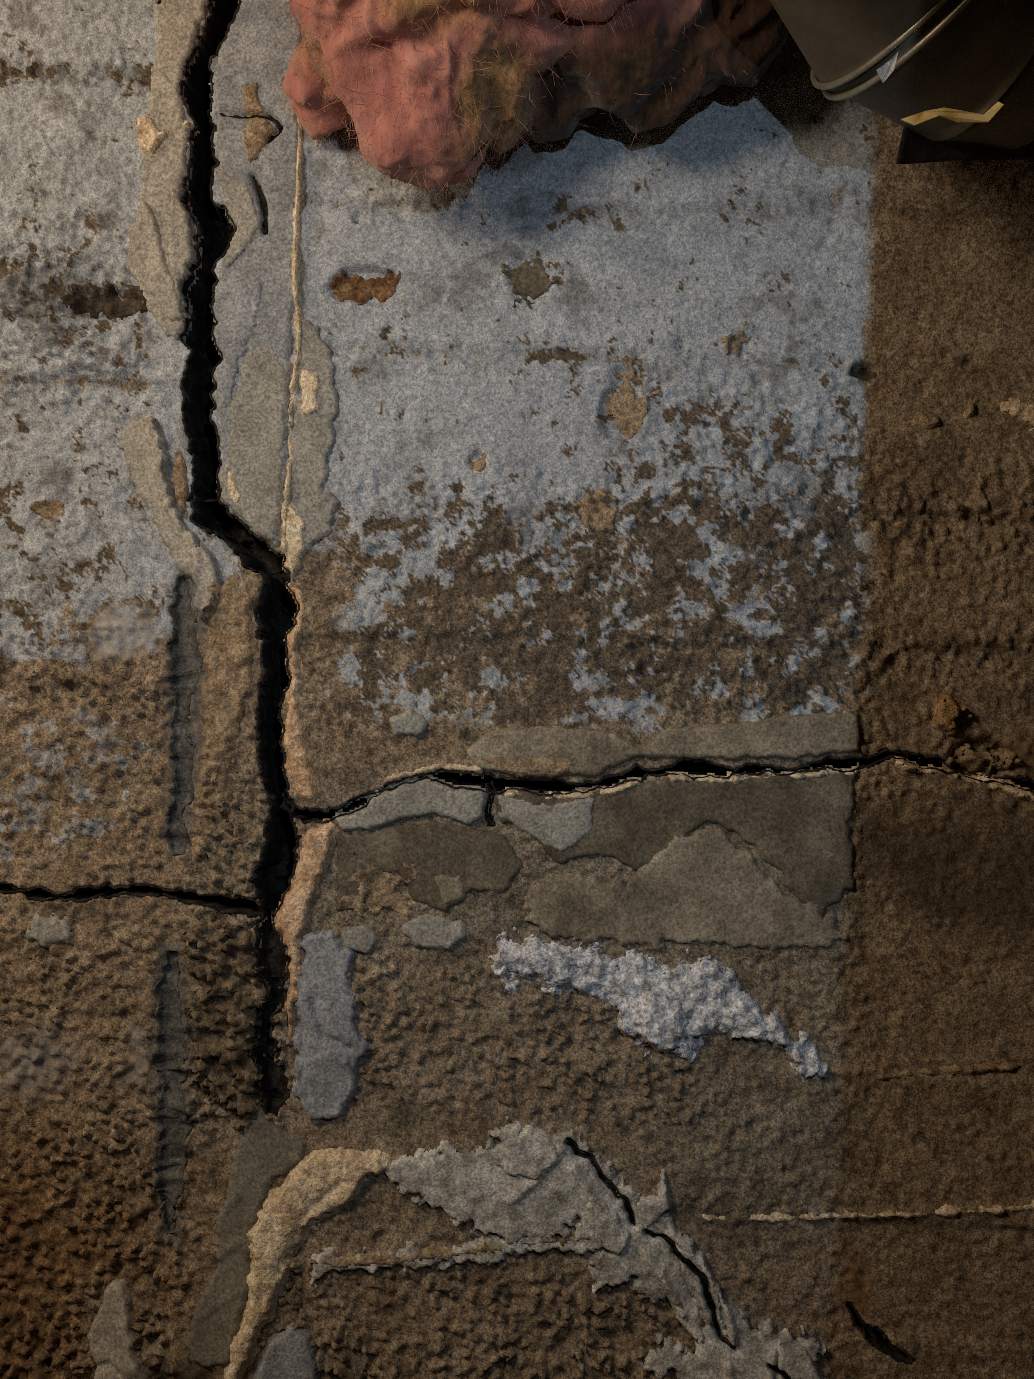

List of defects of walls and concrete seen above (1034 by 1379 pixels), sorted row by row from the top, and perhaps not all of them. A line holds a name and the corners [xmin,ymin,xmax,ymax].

flaking render [61,0,215,343]
flaking render [209,0,341,583]
crack [0,0,302,1116]
spalling [467,453,486,472]
spalling [568,488,619,532]
crack [291,748,1034,826]
crack [151,949,194,1241]
flaking render [180,707,860,1379]
crack [566,1138,736,1351]
crack [769,1364,791,1379]
crack [846,1302,914,1364]